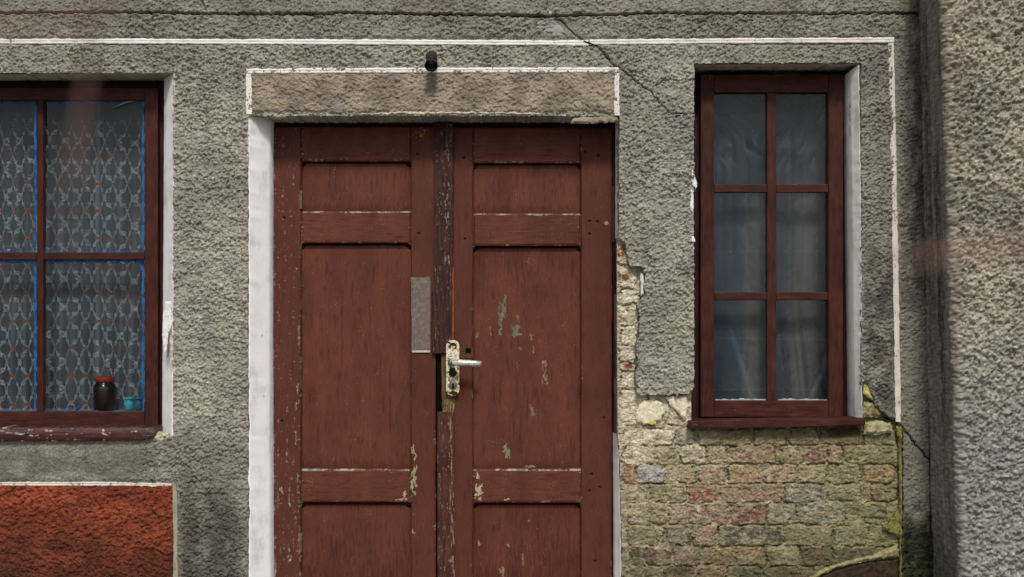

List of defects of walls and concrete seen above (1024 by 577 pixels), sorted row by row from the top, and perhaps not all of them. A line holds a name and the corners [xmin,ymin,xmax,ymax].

crack [0,9,97,17]
crack [139,0,918,115]
flaking render [616,230,902,577]
crack [880,414,930,460]